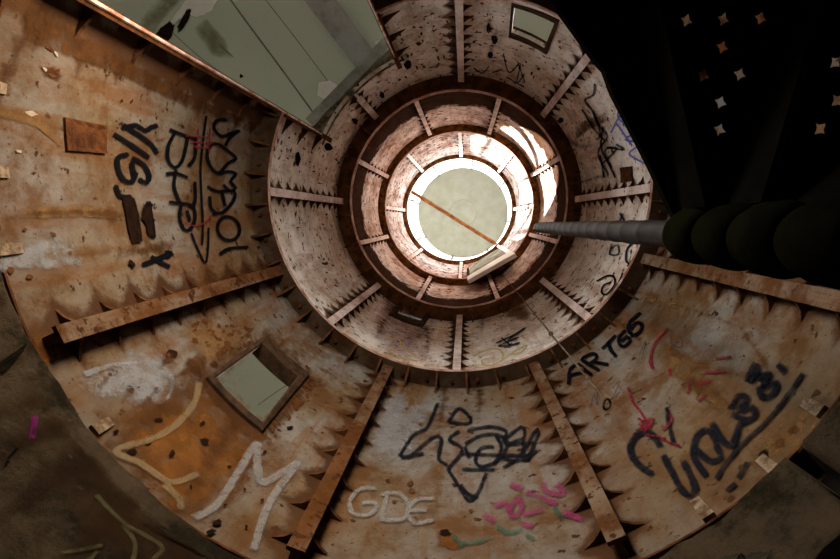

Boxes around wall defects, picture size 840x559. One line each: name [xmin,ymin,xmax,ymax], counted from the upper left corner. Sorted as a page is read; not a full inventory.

peeling [156,0,218,41]
peeling [317,80,338,99]
rust [117,342,317,517]